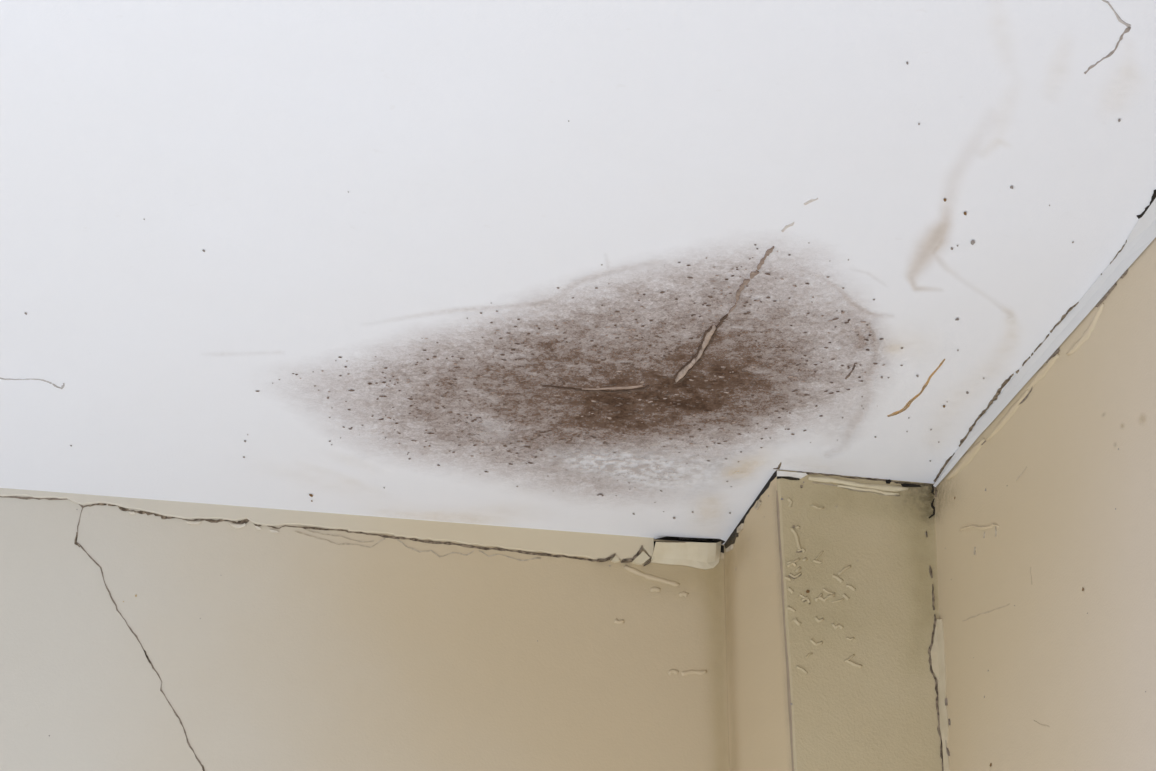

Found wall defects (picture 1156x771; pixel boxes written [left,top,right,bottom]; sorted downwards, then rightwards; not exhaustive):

crack [1084,0,1131,74]
crack [0,496,610,771]
leakage [343,244,889,503]
peeling [597,541,734,570]
crack [674,198,818,383]
crack [773,190,1156,771]